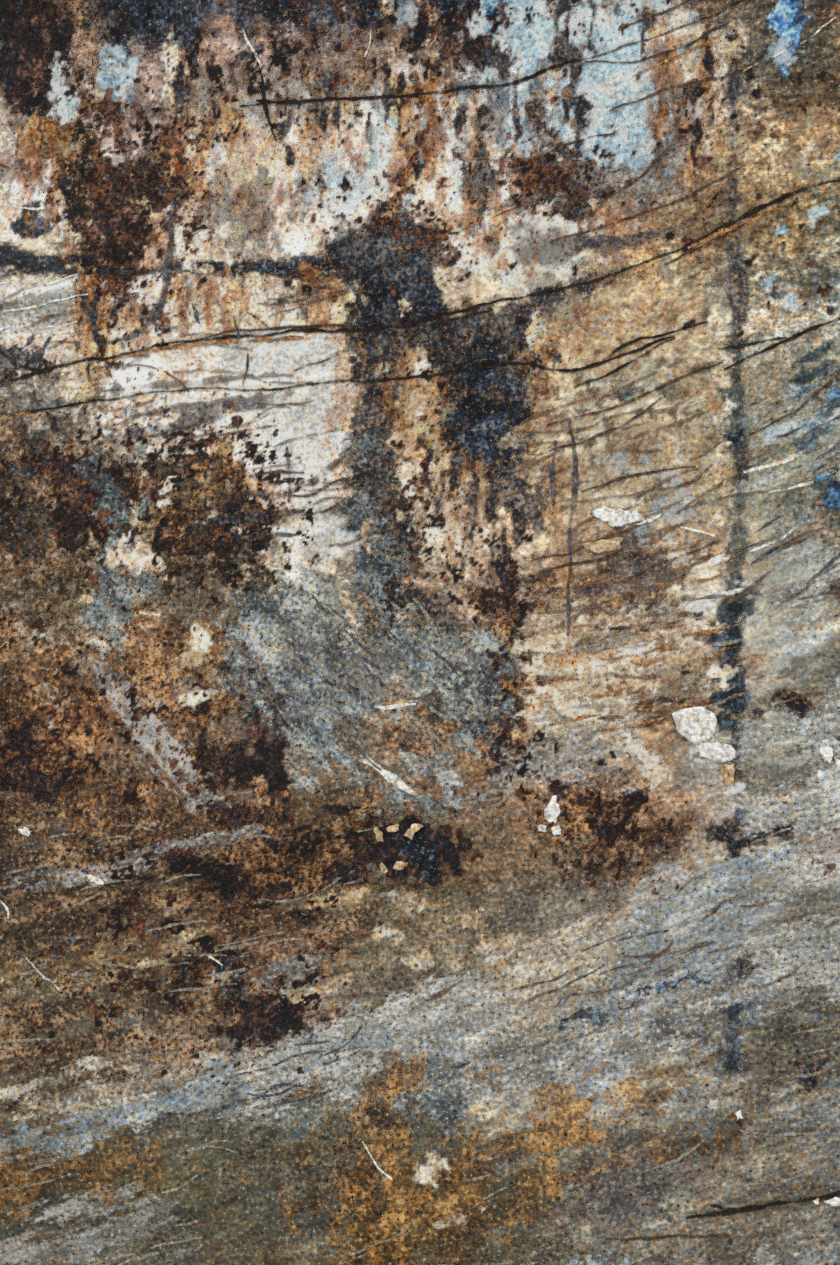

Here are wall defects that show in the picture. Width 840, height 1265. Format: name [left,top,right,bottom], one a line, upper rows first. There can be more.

damp [0,199,348,282]
crack [549,164,746,242]
corrosion [0,0,804,902]
crack [0,179,840,732]
corrosion [0,334,451,1087]
crack [254,593,481,773]
crack [739,688,840,844]
crack [0,825,155,889]
crack [19,874,299,997]
crack [204,871,840,1105]
corrosion [295,1052,685,1265]
crack [502,1126,840,1265]